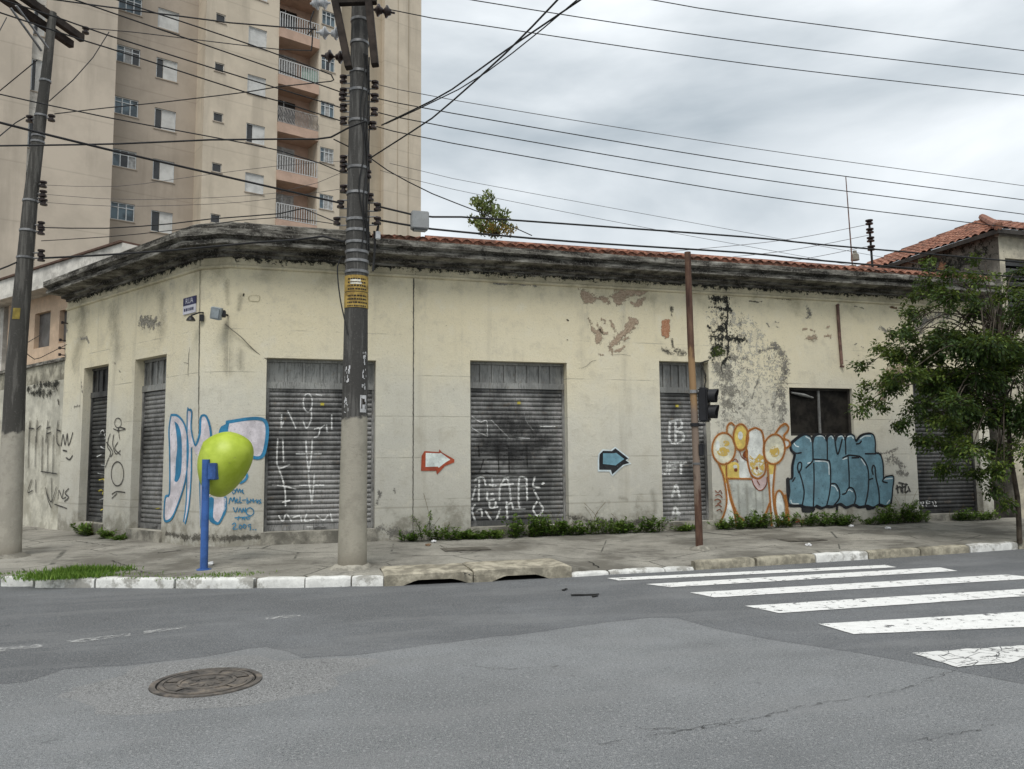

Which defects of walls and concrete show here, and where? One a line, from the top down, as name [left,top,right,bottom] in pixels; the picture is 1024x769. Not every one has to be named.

water stain [233,257,344,267]
flaking render [578,288,648,356]
water stain [369,265,950,368]
flaking render [661,319,670,339]
water stain [759,342,790,423]